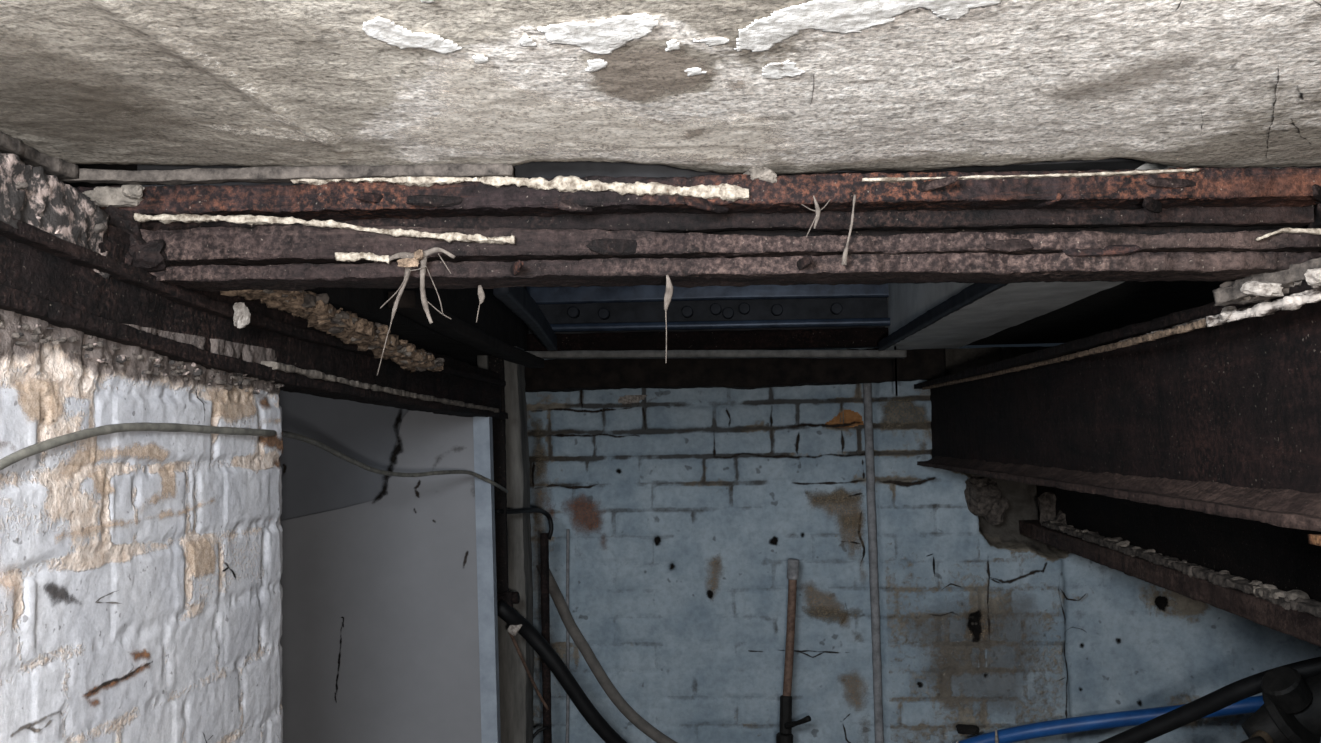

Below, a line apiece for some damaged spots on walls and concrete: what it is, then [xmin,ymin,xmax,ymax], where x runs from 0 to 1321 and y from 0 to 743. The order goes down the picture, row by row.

peeling [363,17,489,64]
peeling [520,0,1002,101]
water stain [207,75,364,142]
water stain [405,60,794,164]
crack [1266,69,1311,158]
corrosion [558,200,592,212]
corrosion [684,196,729,213]
corrosion [1142,178,1196,213]
corrosion [148,239,1321,292]
peeling [882,286,1321,430]
spalling [64,444,213,519]
spalling [713,410,865,526]